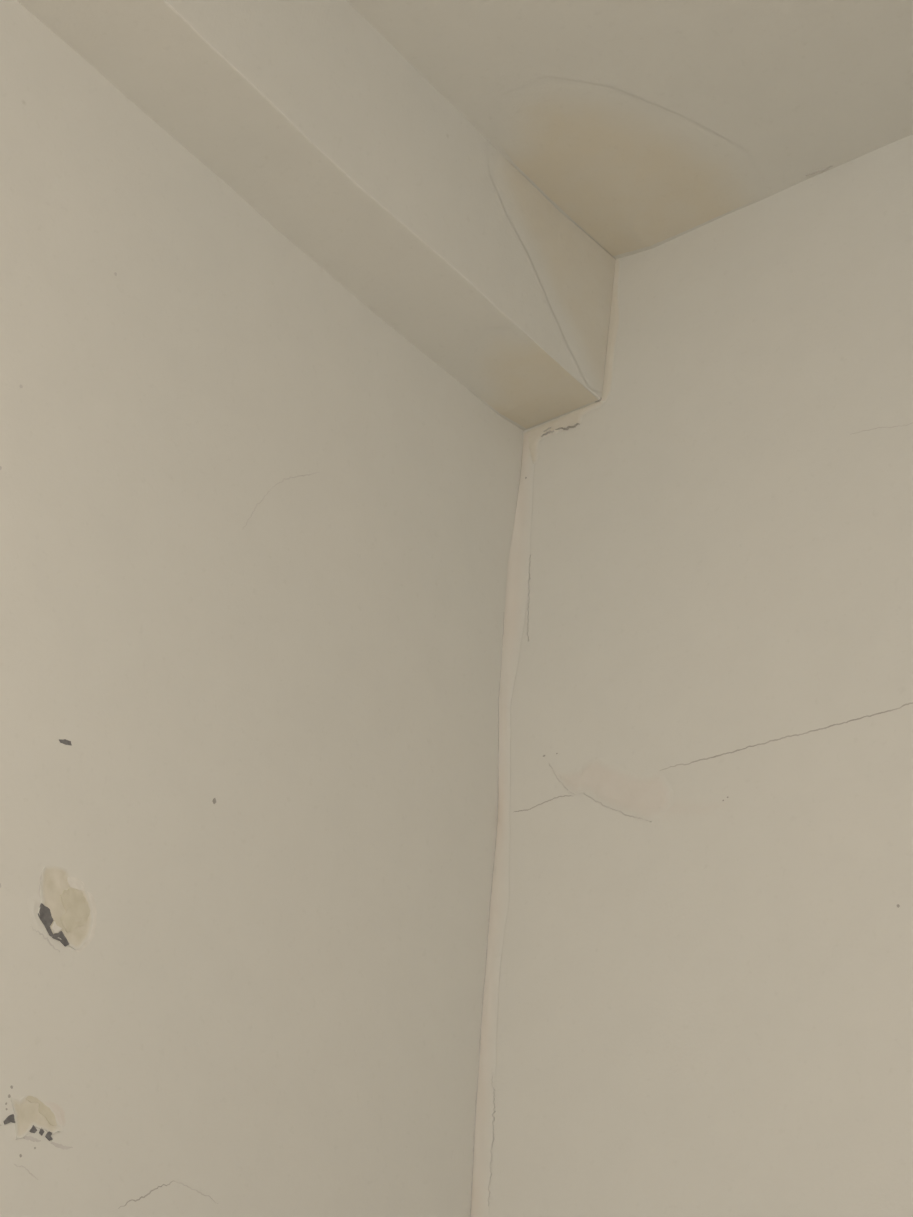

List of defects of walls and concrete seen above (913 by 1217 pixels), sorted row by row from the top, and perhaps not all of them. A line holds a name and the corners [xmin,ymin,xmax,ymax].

crack [660,702,913,771]
spalling [27,865,97,952]
spalling [4,1085,73,1180]